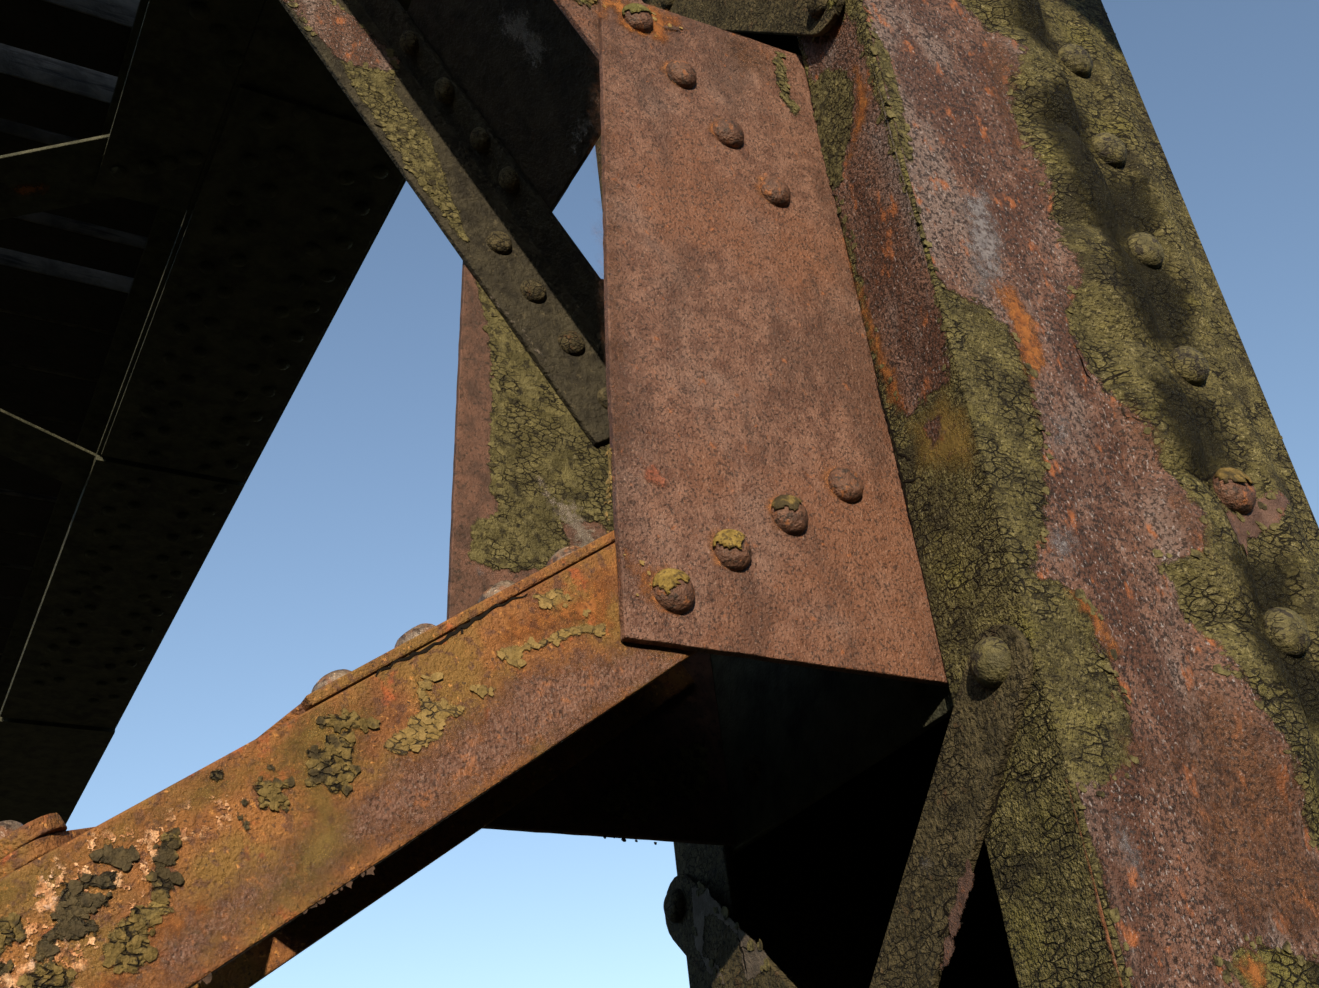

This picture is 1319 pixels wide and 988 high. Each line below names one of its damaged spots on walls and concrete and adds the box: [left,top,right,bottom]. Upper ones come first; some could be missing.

crack [984,767,1012,837]
peeling [691,881,770,985]
crack [937,899,963,937]
corrosion [1069,790,1123,988]